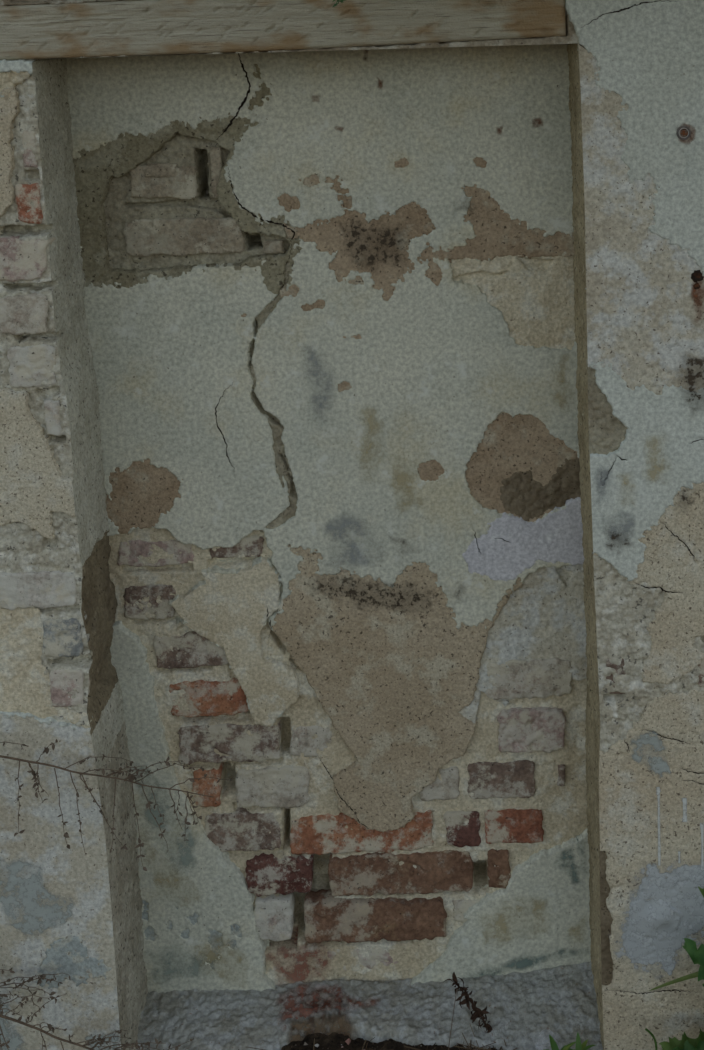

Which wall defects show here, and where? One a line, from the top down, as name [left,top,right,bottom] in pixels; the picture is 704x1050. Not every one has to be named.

peeling [0,58,121,1050]
crack [215,53,251,147]
crack [215,168,298,532]
peeling [73,14,704,455]
spalling [106,412,704,1050]